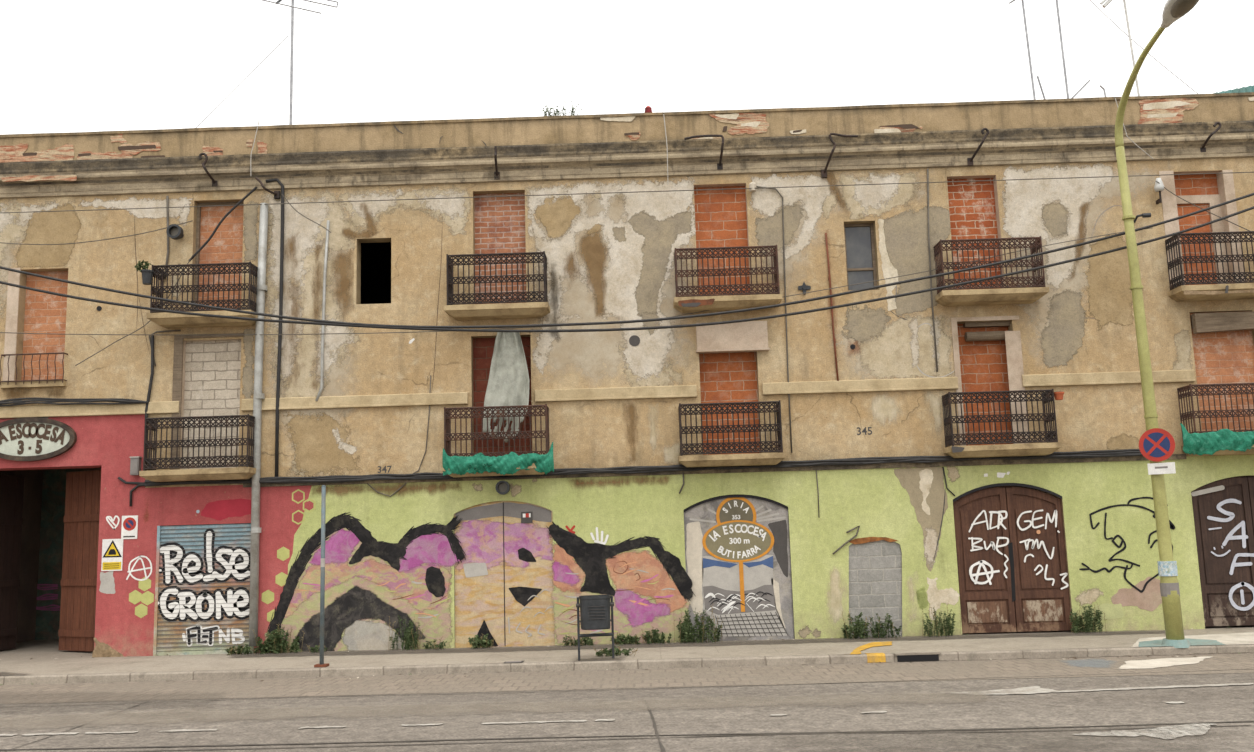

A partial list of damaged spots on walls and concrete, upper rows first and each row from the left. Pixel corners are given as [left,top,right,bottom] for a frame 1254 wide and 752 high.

flaking render [0,134,165,182]
flaking render [692,113,769,139]
flaking render [1138,98,1199,124]
flaking render [0,197,193,317]
flaking render [242,186,471,399]
leakage [533,195,629,378]
flaking render [525,177,715,387]
leakage [656,244,690,362]
peeling [750,172,955,379]
flaking render [1002,163,1143,368]
flaking render [287,412,361,477]
flaking render [894,446,964,625]